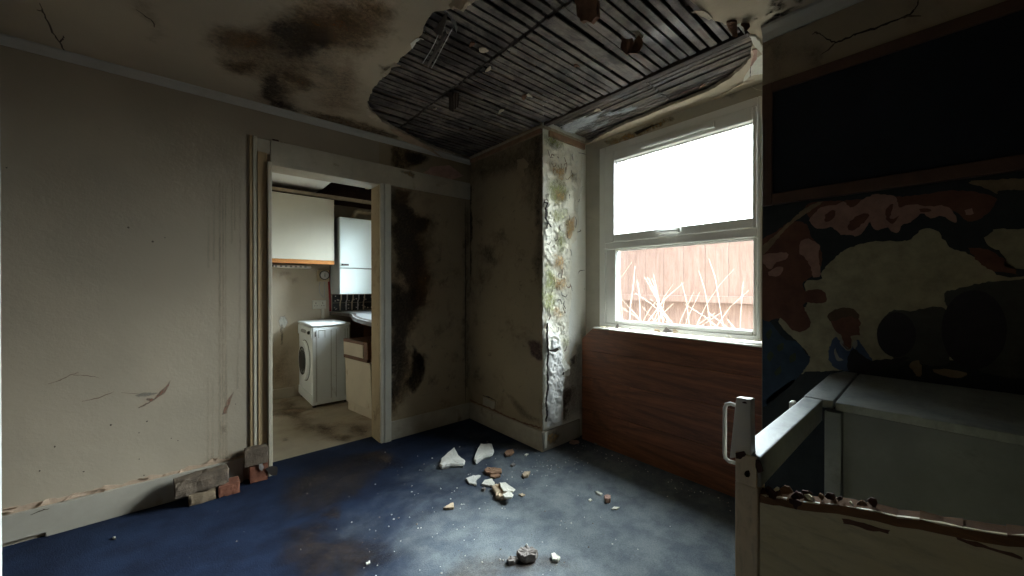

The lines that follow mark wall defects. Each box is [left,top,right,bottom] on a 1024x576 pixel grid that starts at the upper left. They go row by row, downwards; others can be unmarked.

crack [38,3,65,50]
damp [220,0,385,111]
flaking render [691,10,713,20]
flaking render [712,20,763,100]
crack [797,0,921,55]
damp [309,73,398,138]
damp [391,191,430,406]
peeling [542,136,586,448]
peeling [2,456,243,515]